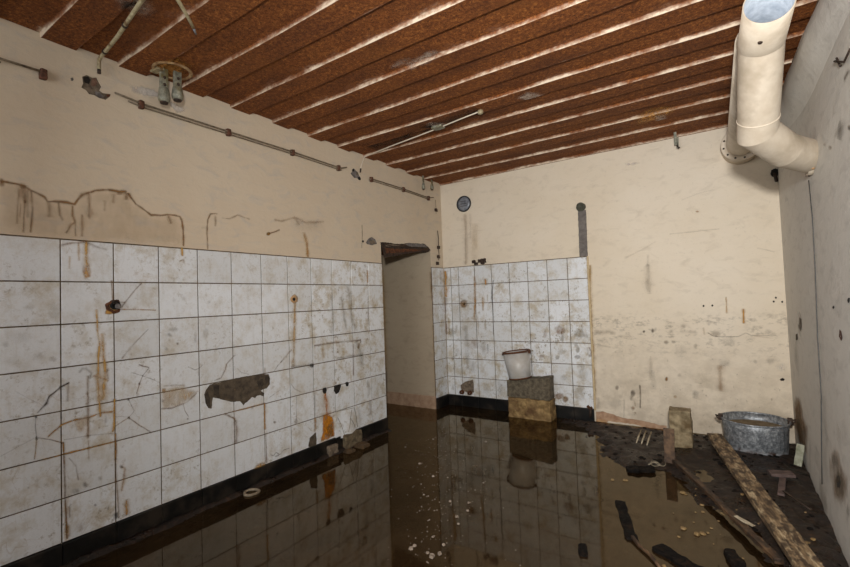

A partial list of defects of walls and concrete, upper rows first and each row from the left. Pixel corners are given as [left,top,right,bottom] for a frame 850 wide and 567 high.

flaking render [70,75,111,100]
leakage [0,179,184,246]
crack [34,382,69,459]
rust [43,282,118,486]
spalling [204,374,270,409]
rust [315,393,334,441]